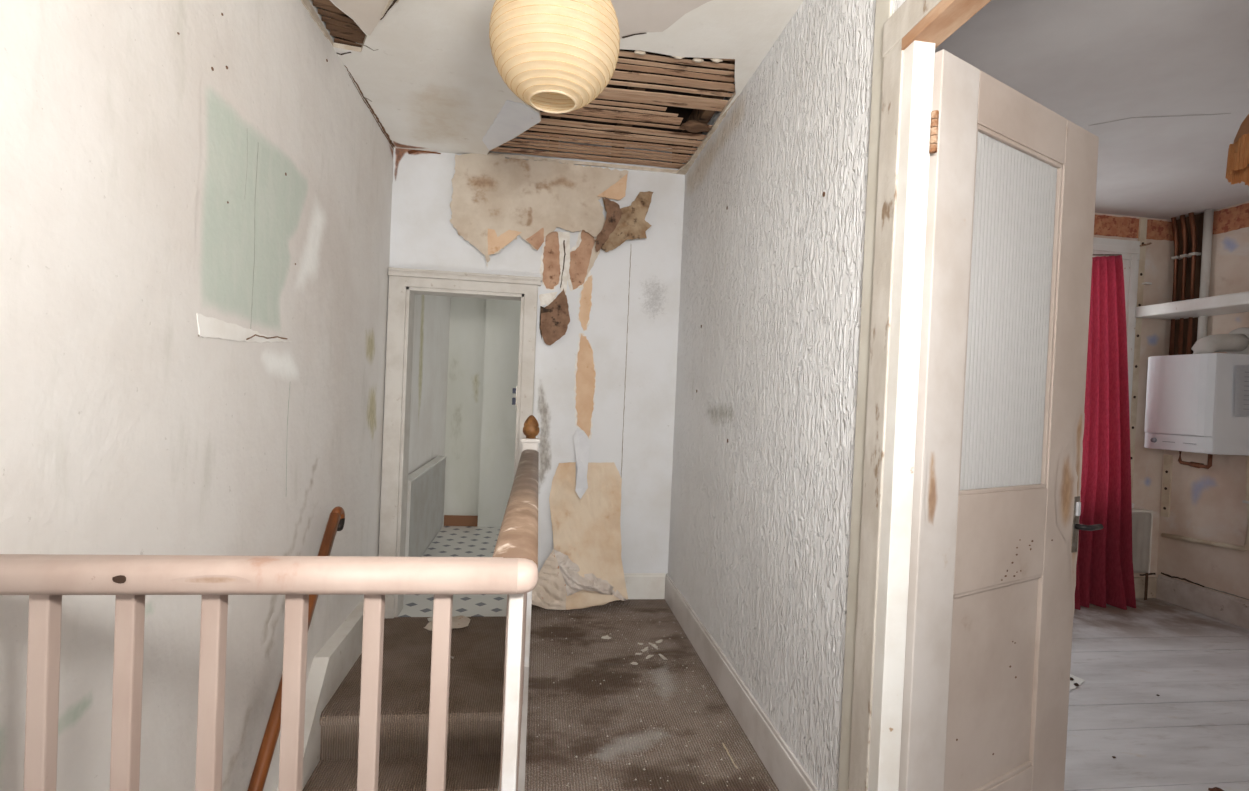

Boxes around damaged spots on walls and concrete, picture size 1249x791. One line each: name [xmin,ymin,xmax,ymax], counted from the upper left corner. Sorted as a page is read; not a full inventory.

spalling [301,0,366,47]
spalling [482,0,739,200]
peeling [196,314,291,343]
peeling [539,230,596,439]